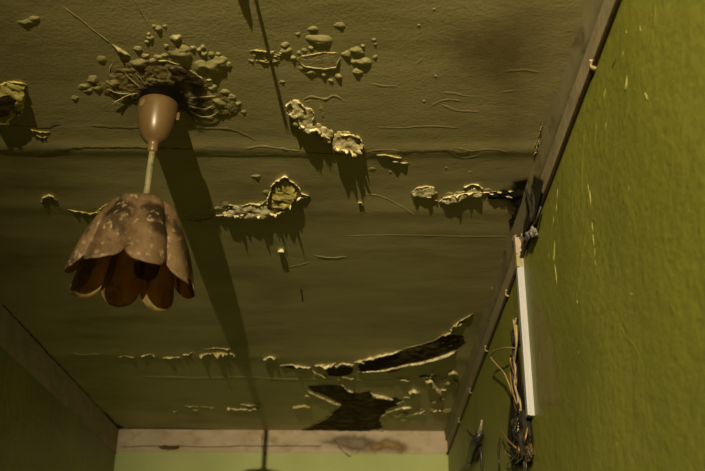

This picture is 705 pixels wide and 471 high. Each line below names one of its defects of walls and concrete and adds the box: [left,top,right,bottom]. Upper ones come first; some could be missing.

peeling [0,81,26,126]
peeling [285,95,364,158]
peeling [182,176,310,223]
peeling [412,184,496,205]
peeling [164,347,236,359]
flaking render [263,314,472,432]
water stain [334,437,405,457]